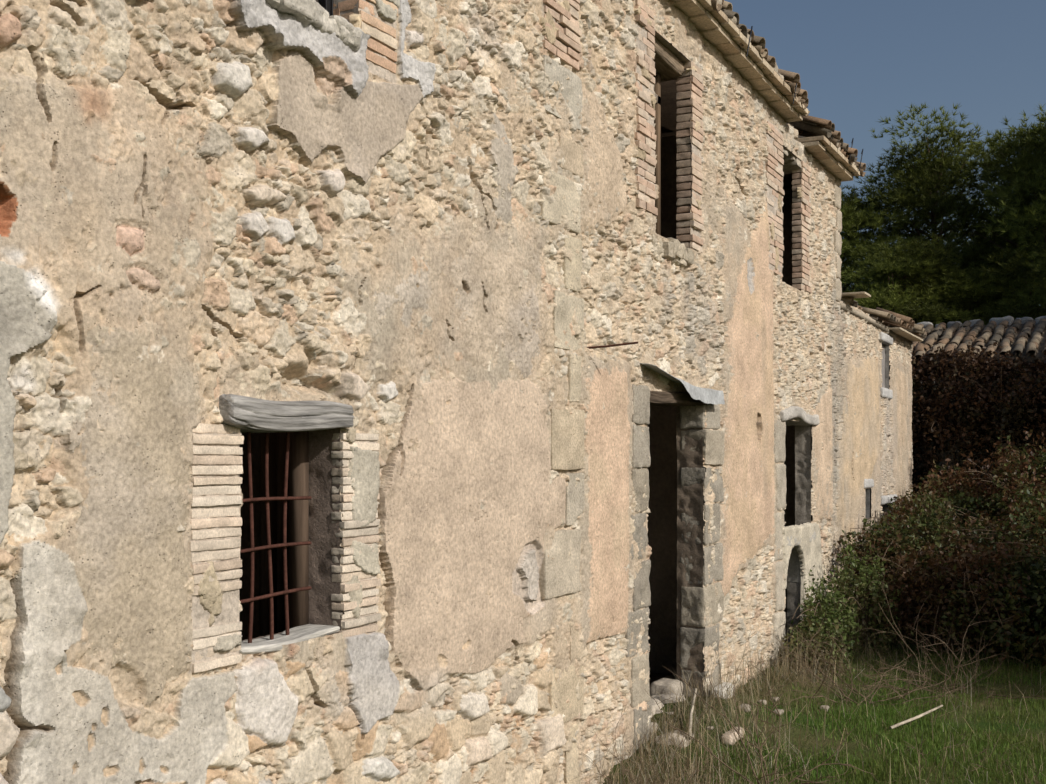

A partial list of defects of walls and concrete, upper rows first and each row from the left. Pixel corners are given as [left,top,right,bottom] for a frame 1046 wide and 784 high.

spalling [0,0,547,390]
flaking render [0,239,567,784]
spalling [579,0,699,784]
flaking render [701,59,909,688]